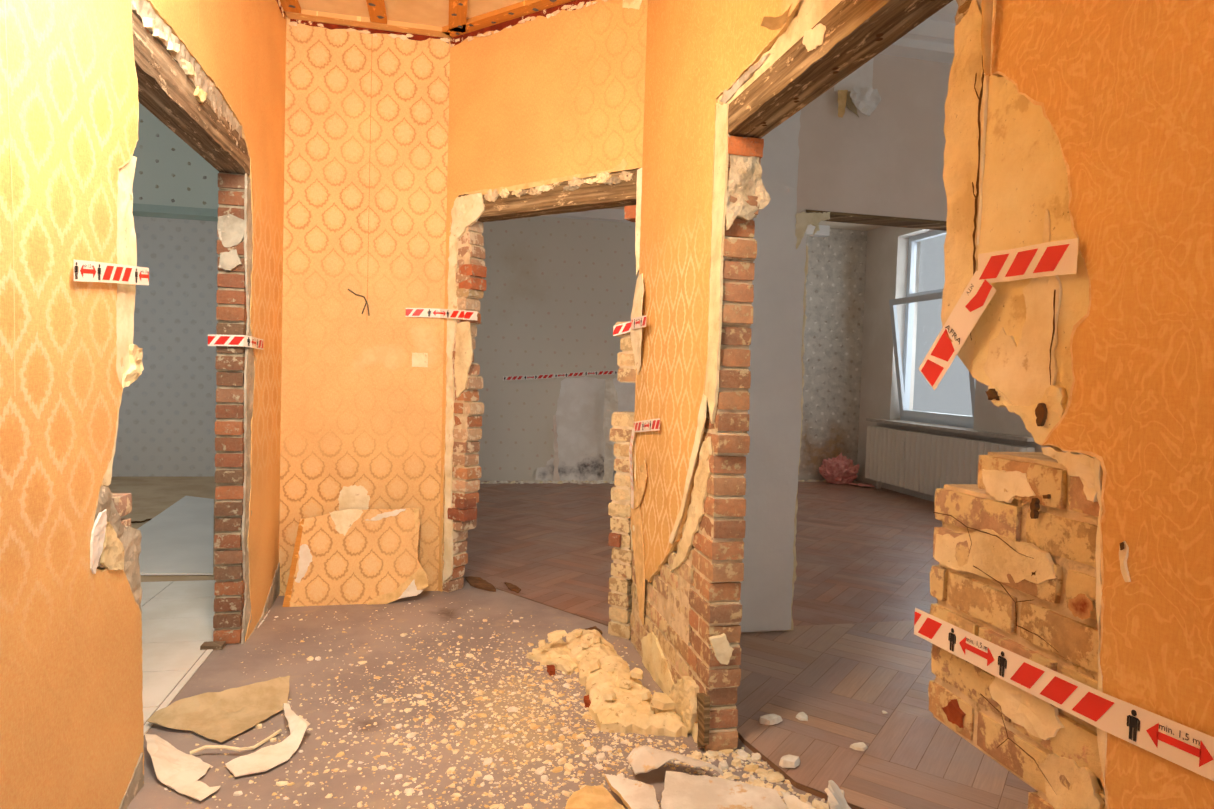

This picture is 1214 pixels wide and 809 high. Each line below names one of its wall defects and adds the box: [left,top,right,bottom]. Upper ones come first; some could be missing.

spalling [622,0,642,10]
spalling [718,0,842,104]
peeling [834,58,881,118]
flaking render [624,205,636,223]
flaking render [930,0,1103,692]
spalling [90,485,142,614]
peeling [338,485,370,511]
spalling [630,436,712,748]
crack [933,512,1058,652]
flaking render [928,644,1107,809]
crack [980,693,1055,792]